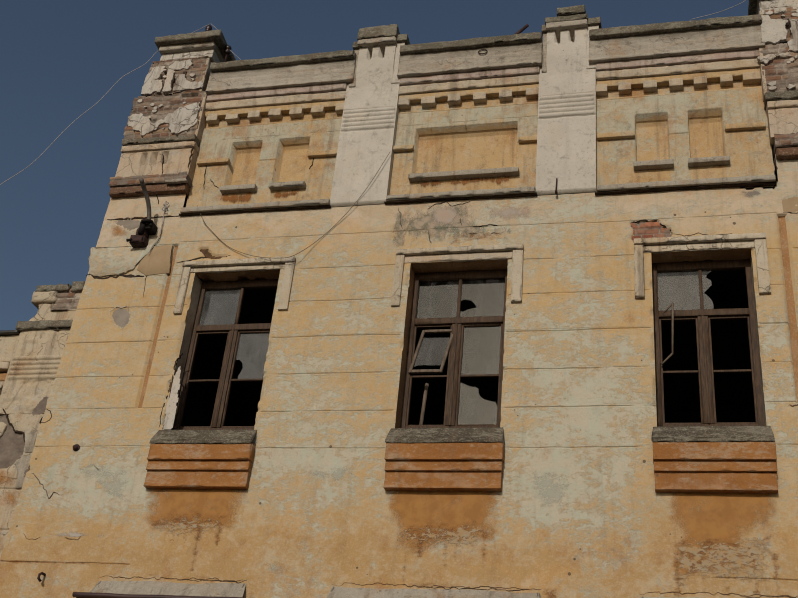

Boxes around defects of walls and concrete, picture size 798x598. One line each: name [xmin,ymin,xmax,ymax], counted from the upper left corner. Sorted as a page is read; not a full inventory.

spalling [757,6,798,93]
spalling [123,56,208,139]
spalling [630,219,672,241]
spalling [32,397,48,416]
spalling [162,366,181,430]
spalling [0,409,38,489]